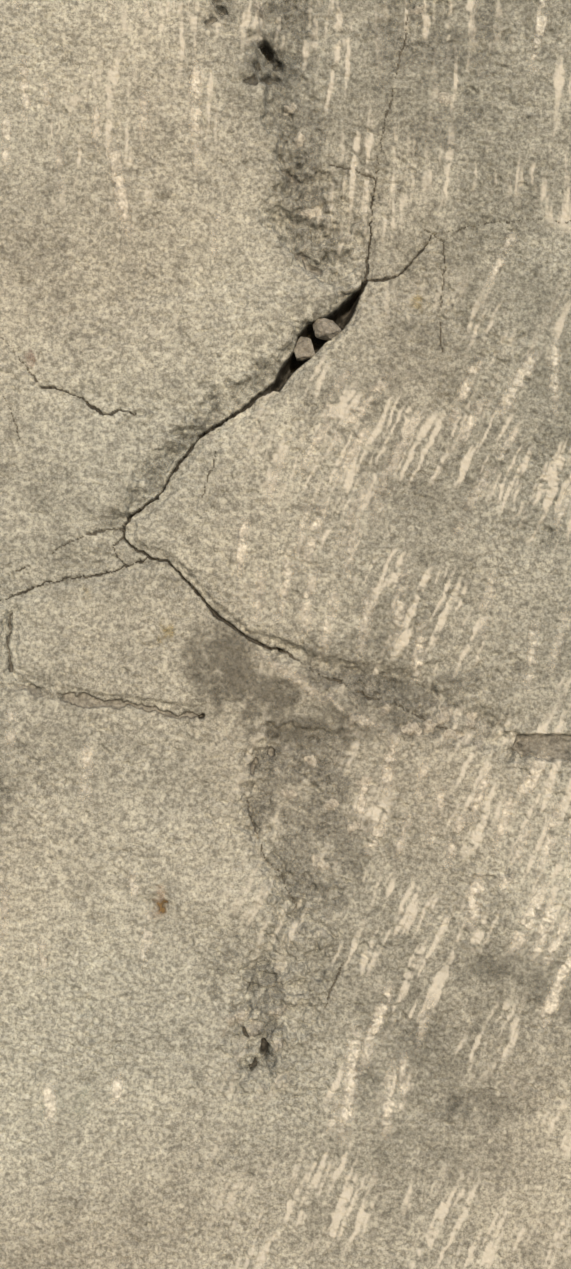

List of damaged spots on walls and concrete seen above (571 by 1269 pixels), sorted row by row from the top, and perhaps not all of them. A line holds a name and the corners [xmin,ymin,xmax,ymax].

damp [243,40,294,88]
crack [0,17,571,730]